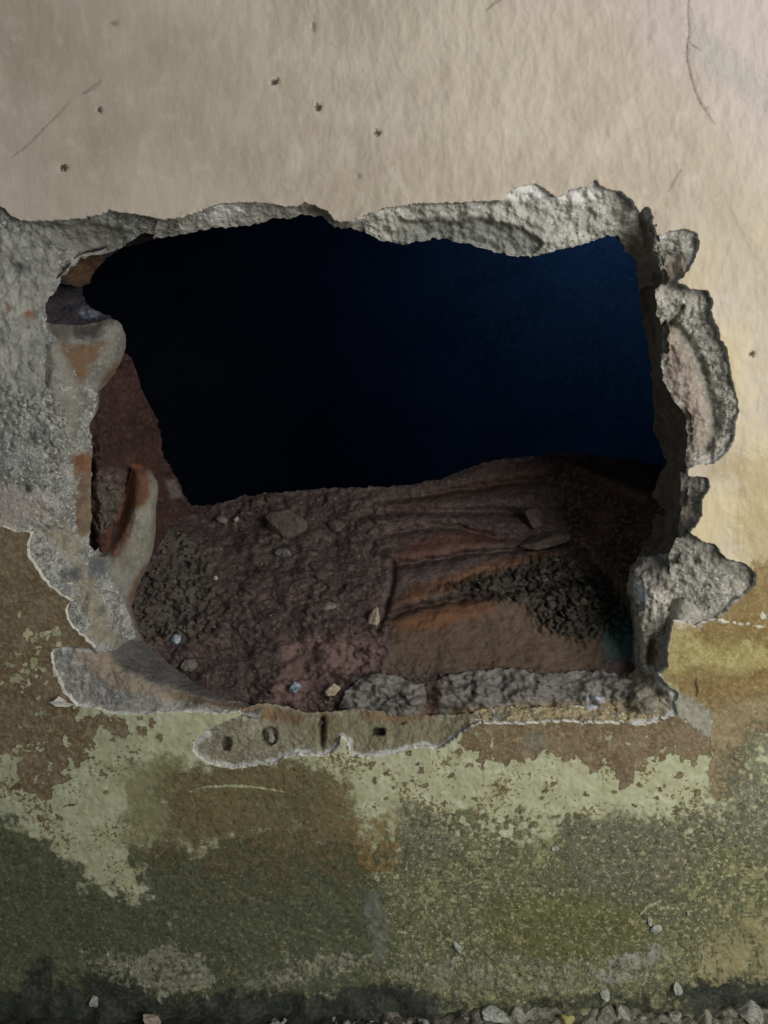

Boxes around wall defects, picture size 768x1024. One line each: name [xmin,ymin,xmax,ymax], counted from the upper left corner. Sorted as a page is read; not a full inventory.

spalling [0,181,768,822]
water stain [0,717,768,1024]